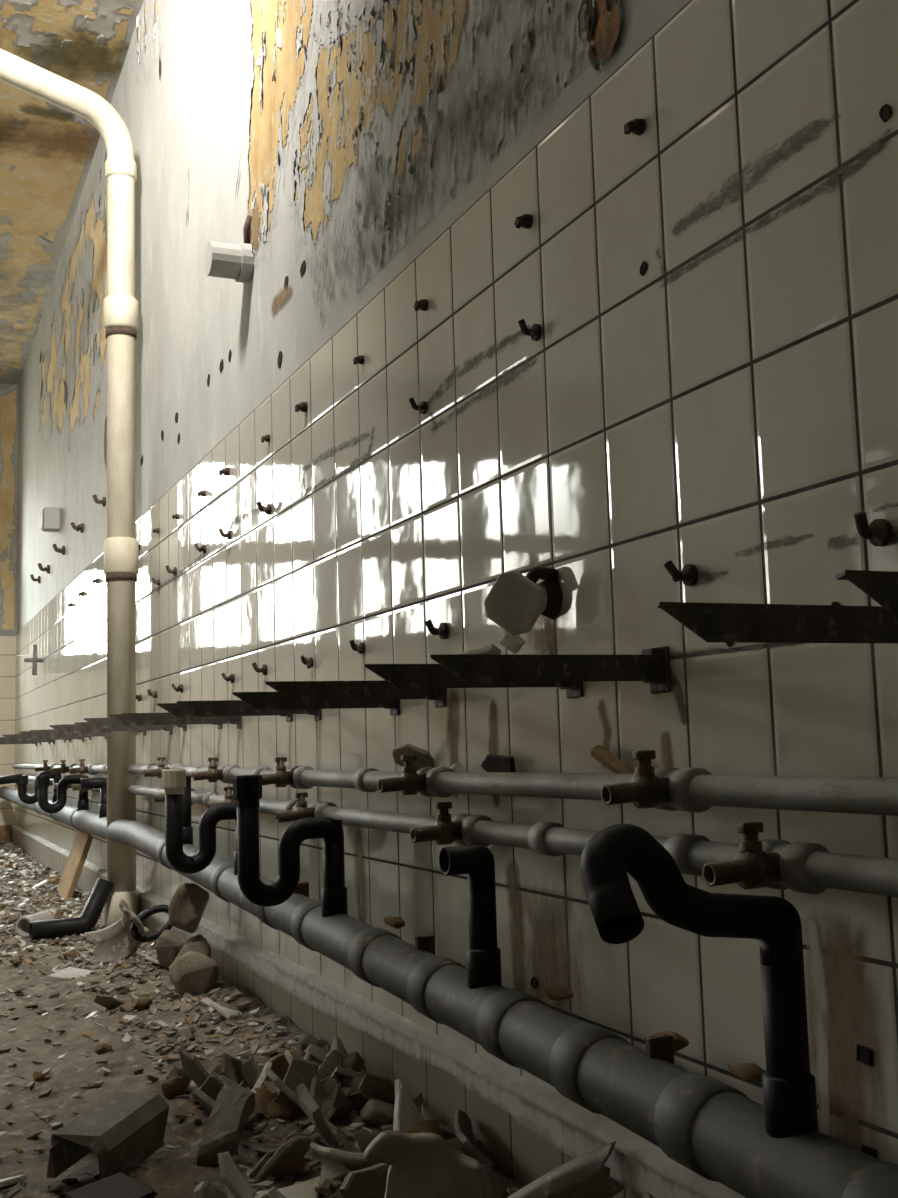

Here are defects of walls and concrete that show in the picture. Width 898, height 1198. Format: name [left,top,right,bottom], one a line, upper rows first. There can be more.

leakage [0,107,99,156]
leakage [32,30,129,78]
peeling [0,0,171,107]
peeling [246,0,621,298]
leakage [311,14,572,320]
peeling [0,81,107,629]
corrosion [805,917,880,1151]